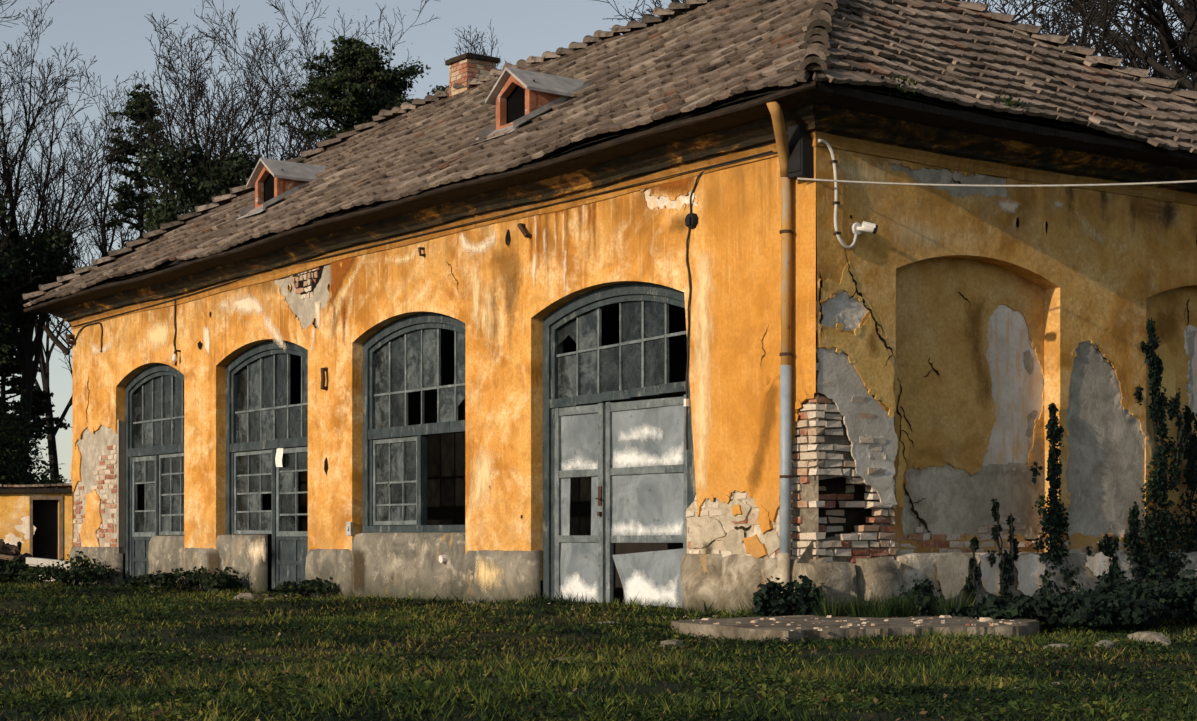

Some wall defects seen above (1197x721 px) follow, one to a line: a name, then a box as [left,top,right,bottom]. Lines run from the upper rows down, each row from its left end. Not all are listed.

flaking render [887,160,1007,202]
flaking render [274,262,342,330]
leakage [472,254,517,338]
leakage [532,214,566,283]
flaking render [71,419,125,553]
flaking render [686,262,1046,599]
crack [819,249,940,534]
flaking render [1063,325,1197,576]